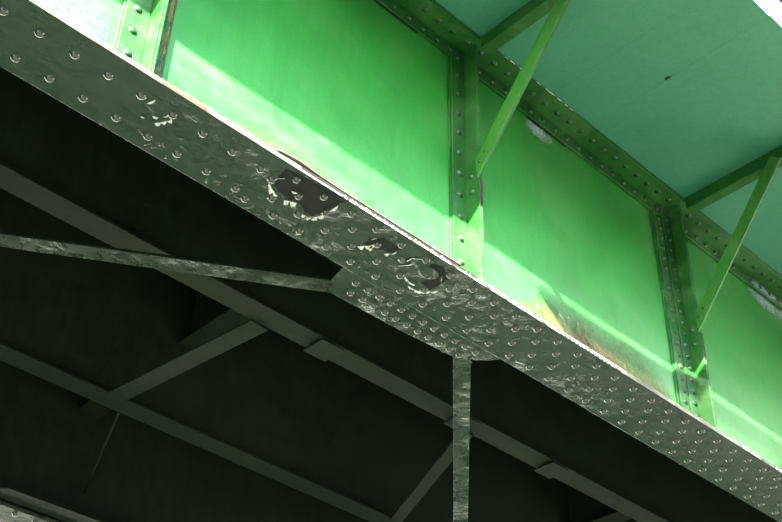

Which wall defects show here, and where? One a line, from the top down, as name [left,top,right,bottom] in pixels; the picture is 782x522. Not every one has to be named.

peeling [139,92,177,128]
spalling [225,169,491,290]